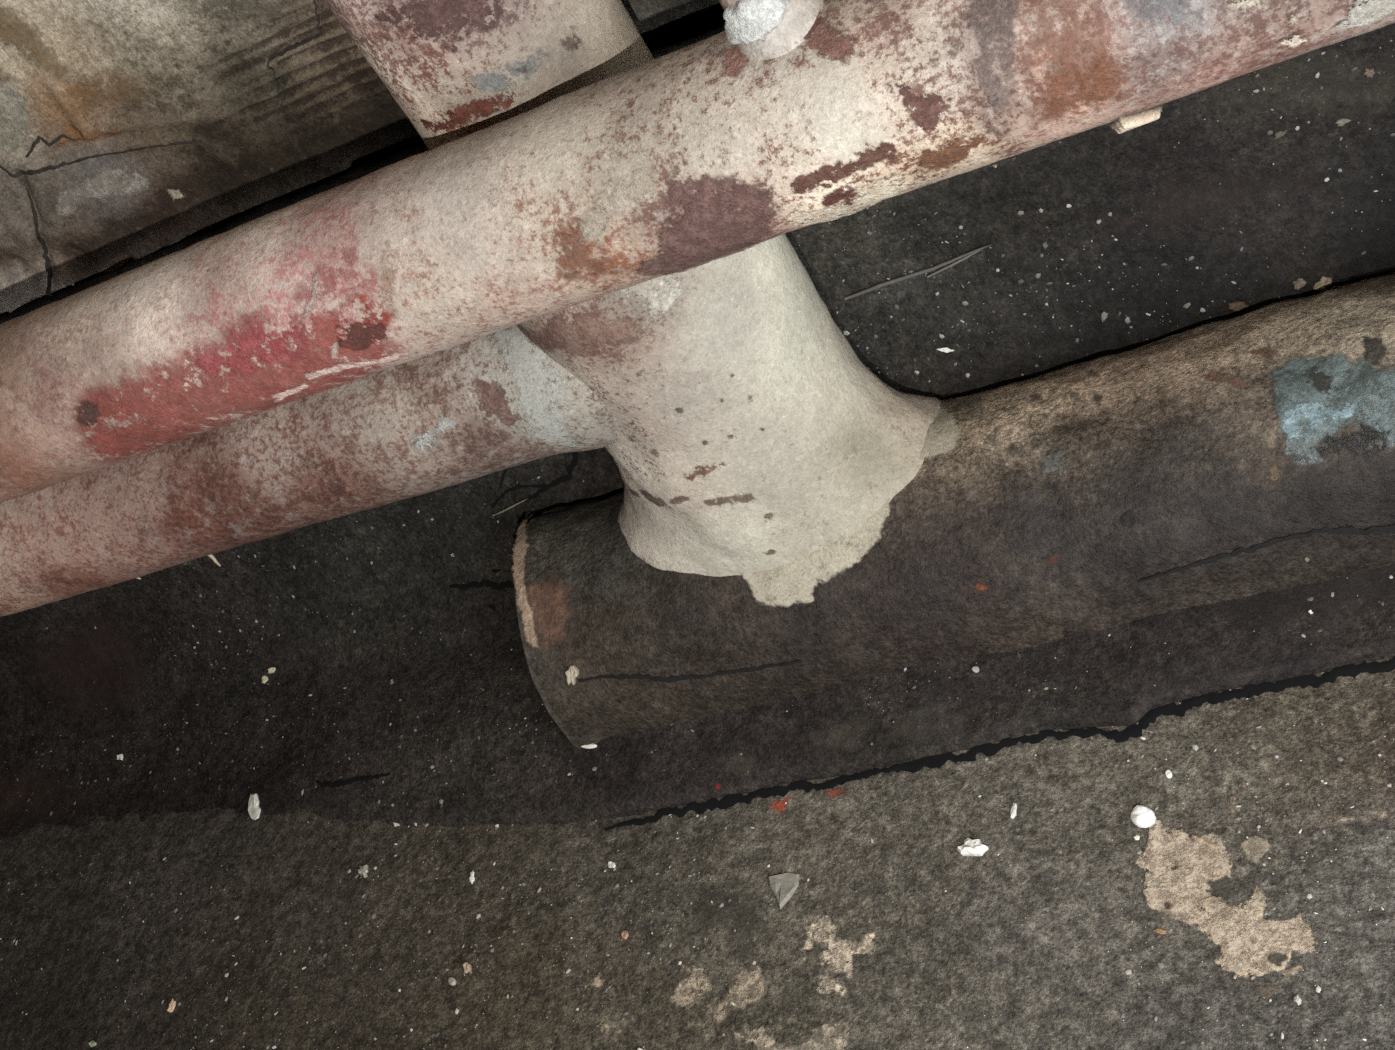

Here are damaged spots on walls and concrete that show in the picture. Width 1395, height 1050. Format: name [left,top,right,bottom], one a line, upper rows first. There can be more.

corrosion [375,0,505,53]
corrosion [1030,0,1124,122]
corrosion [420,92,514,133]
corrosion [887,80,985,173]
crack [0,134,215,296]
corrosion [554,161,780,280]
corrosion [790,143,898,207]
corrosion [335,322,387,351]
spalling [1300,367,1340,394]
hole [1317,423,1389,456]
crack [578,657,1395,831]
peeling [1136,820,1319,999]